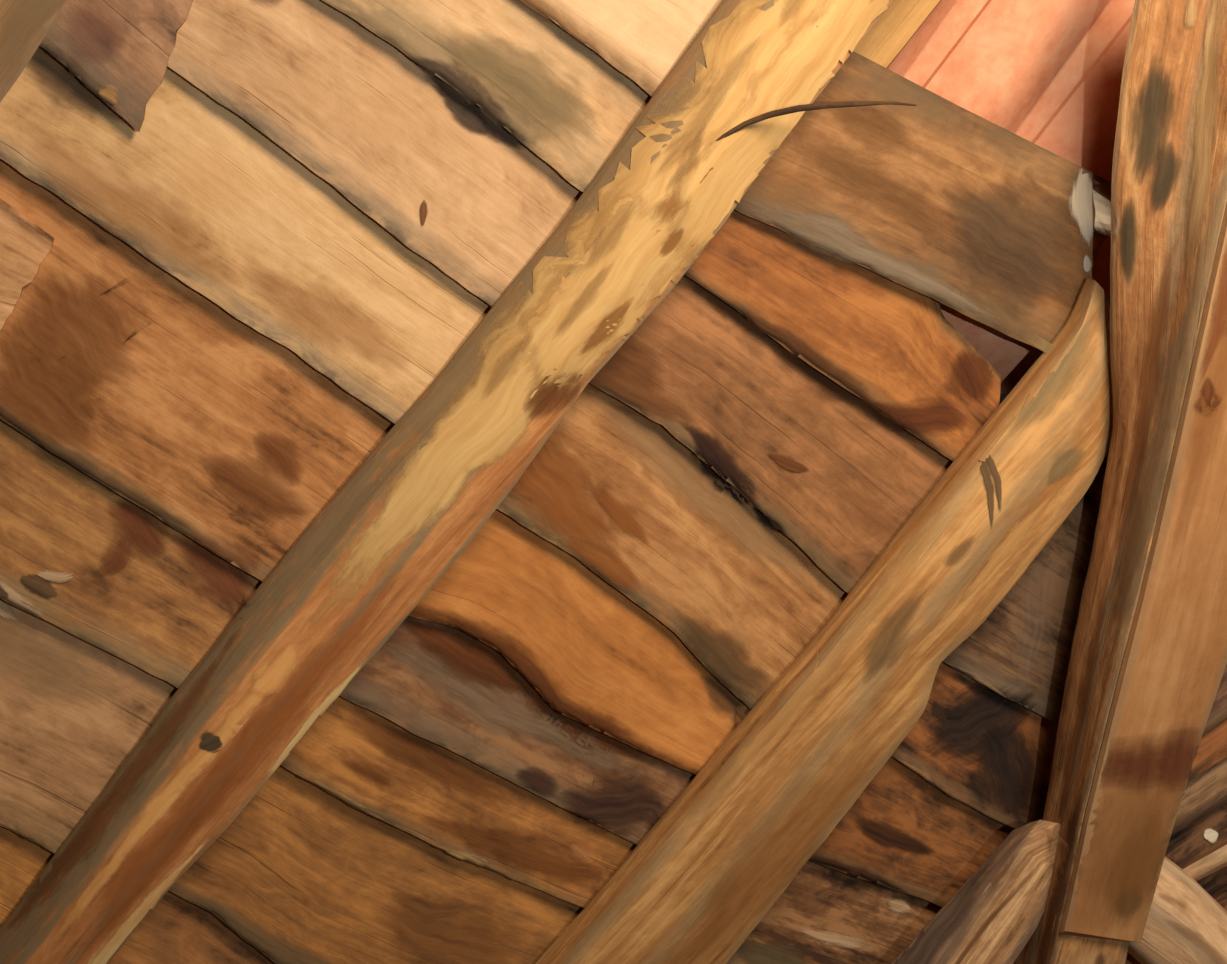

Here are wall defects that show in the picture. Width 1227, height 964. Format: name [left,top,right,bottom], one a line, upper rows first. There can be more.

leakage [412,43,581,147]
leakage [1134,67,1177,209]
leakage [1121,203,1136,279]
leakage [590,346,794,563]
leakage [934,689,1034,817]
leakage [1039,798,1081,964]